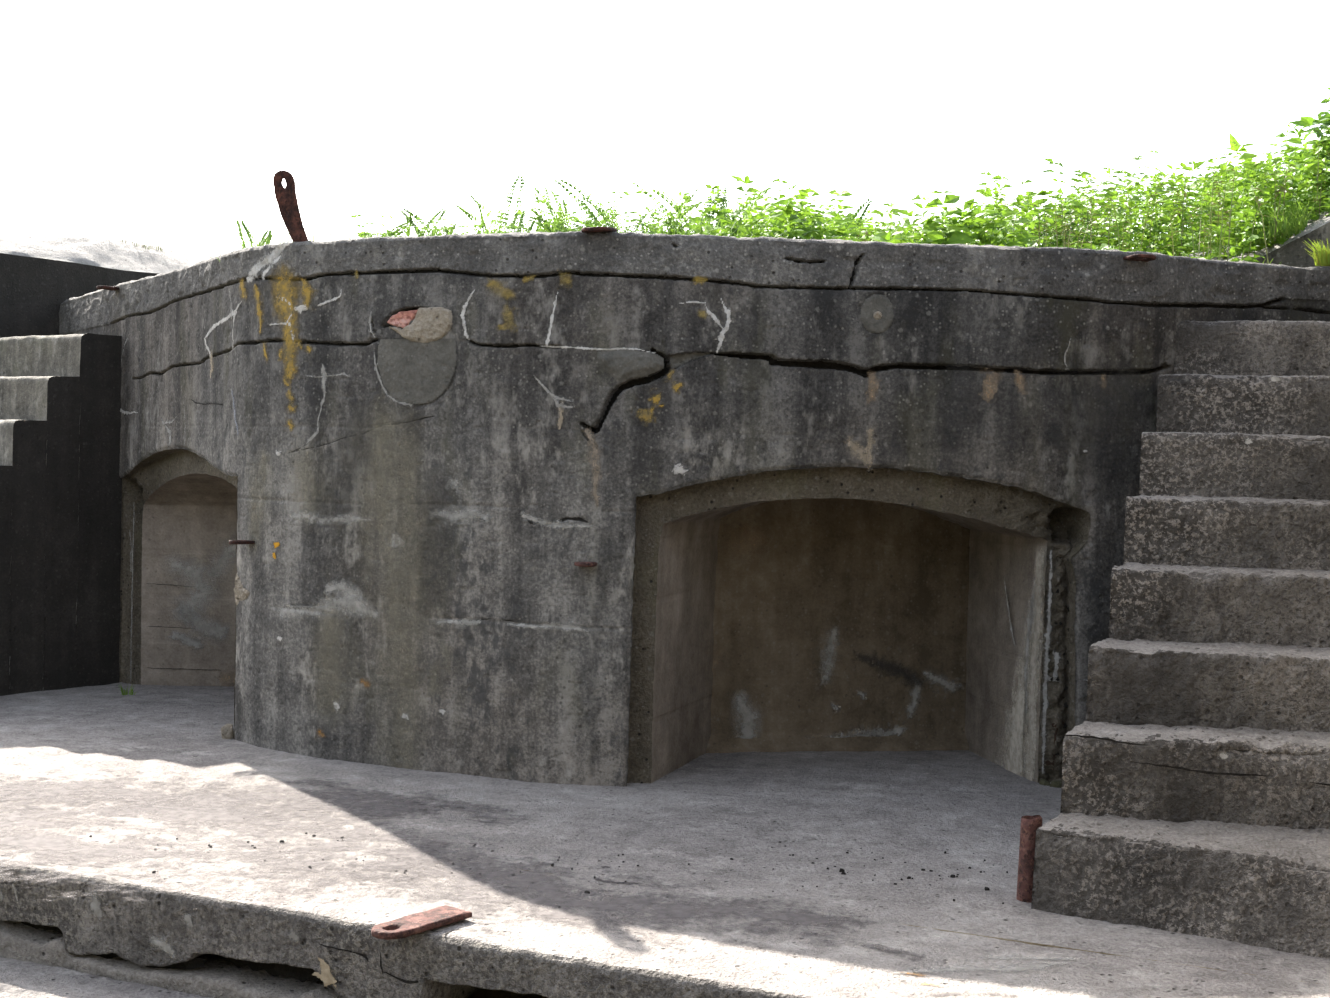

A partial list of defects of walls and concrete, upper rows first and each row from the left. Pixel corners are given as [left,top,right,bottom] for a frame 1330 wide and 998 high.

crack [123,247,1329,320]
efflorescence [204,288,241,379]
efflorescence [269,293,341,340]
spalling [387,307,453,343]
leakage [460,289,475,339]
crack [139,339,378,379]
leakage [368,311,413,407]
crack [714,354,1158,378]
efflorescence [305,364,349,446]
crack [585,351,669,447]
crack [21,922,63,935]
crack [90,944,419,984]